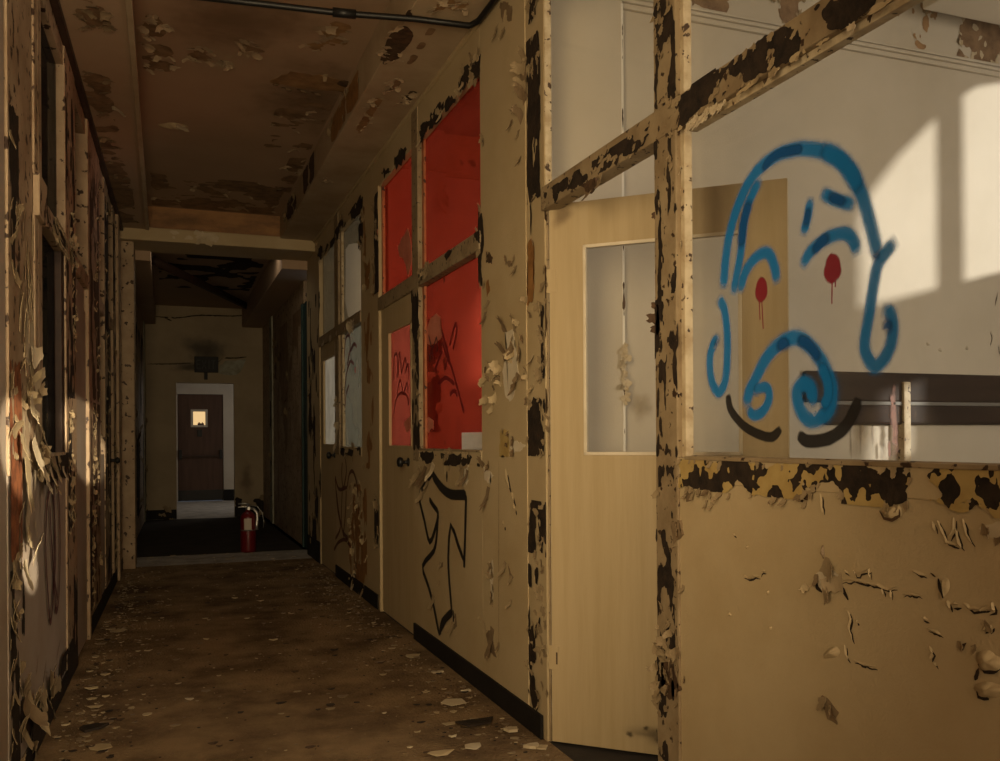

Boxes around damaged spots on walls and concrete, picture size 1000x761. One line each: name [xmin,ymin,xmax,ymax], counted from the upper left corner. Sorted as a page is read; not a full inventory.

peeling [376,10,436,64]
peeling [912,3,939,50]
peeling [957,17,1000,64]
peeling [9,99,119,761]
peeling [150,152,314,230]
peeling [315,47,481,296]
peeling [474,202,549,459]
peeling [524,500,548,711]
peeling [645,511,685,761]
peeling [507,0,913,512]
peeling [816,695,839,724]
peeling [927,469,1000,546]